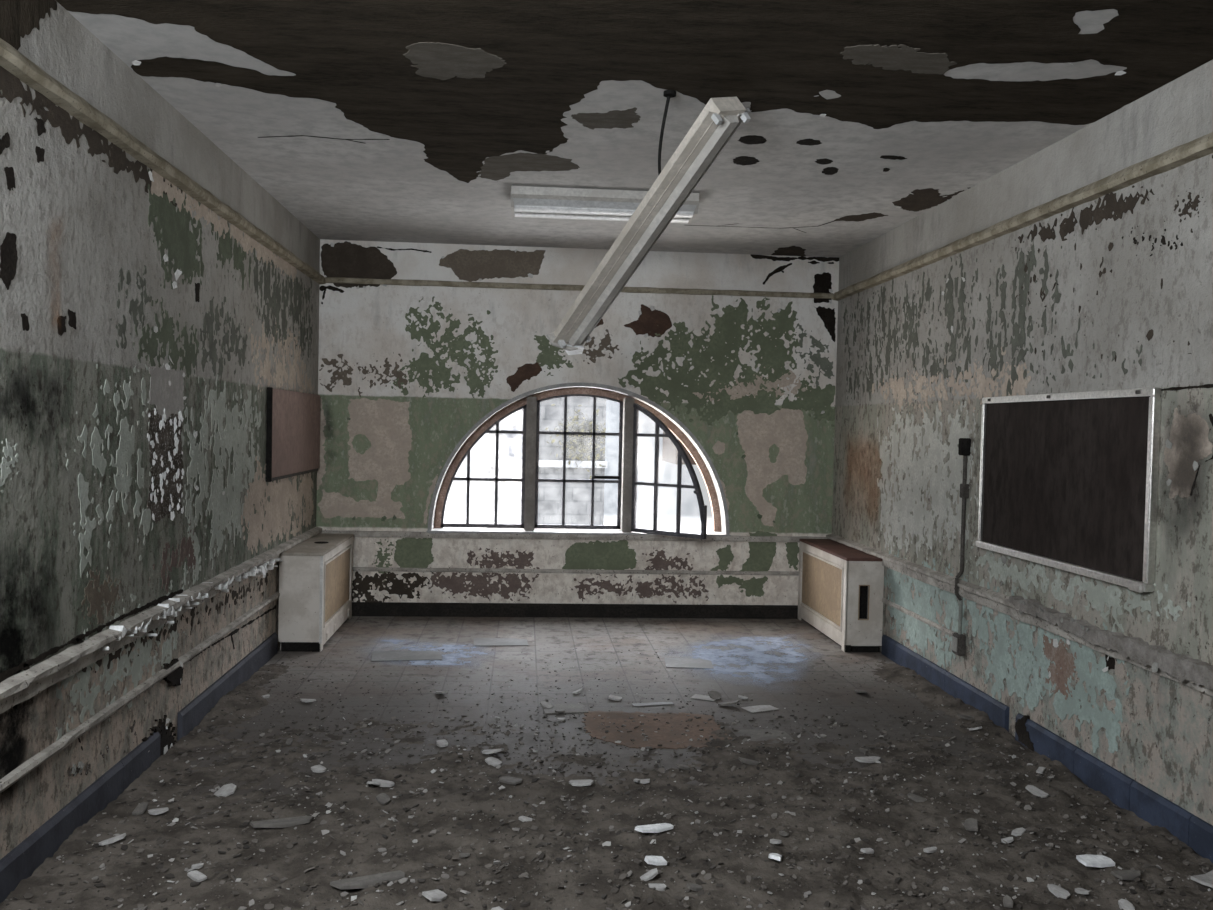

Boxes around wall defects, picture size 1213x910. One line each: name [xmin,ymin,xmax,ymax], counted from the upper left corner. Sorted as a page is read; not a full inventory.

spalling [0,0,1213,183]
peeling [0,66,1213,759]